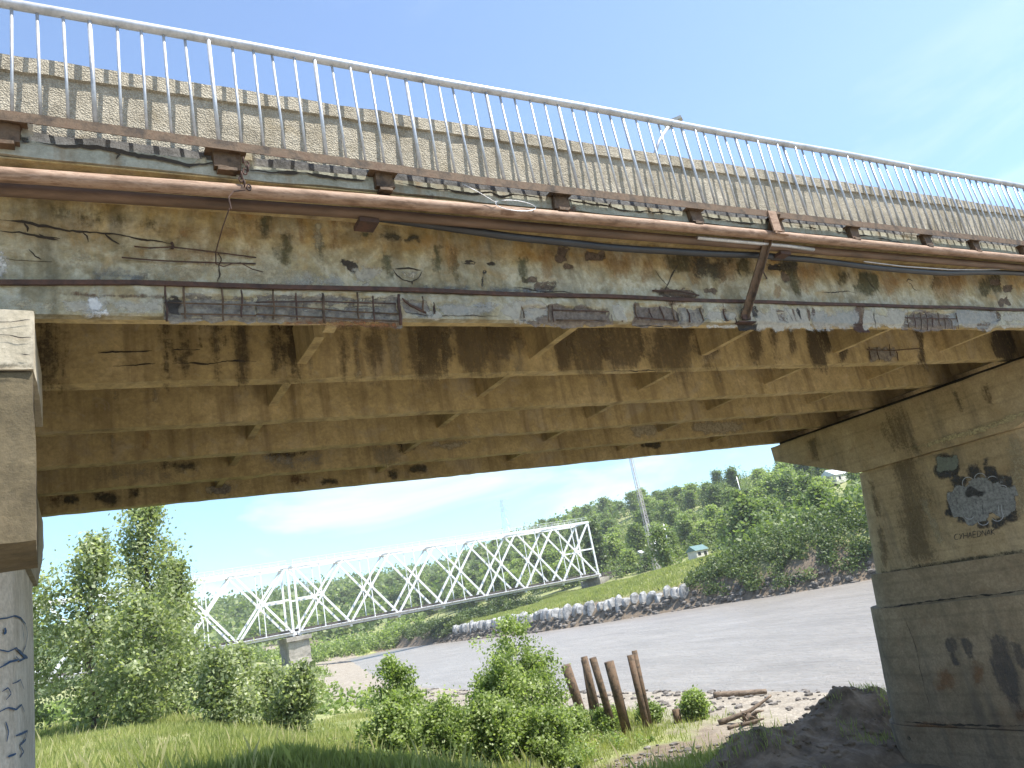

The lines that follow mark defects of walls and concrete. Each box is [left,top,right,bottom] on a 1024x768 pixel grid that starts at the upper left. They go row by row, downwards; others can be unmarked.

crack [36,142,213,168]
crack [3,220,170,262]
spalling [64,259,1024,332]
leakage [667,255,750,280]
leakage [777,261,801,295]
leakage [838,272,879,295]
crack [101,349,256,366]
leakage [154,324,252,402]
leakage [270,325,301,384]
leakage [341,326,524,388]
leakage [554,327,722,384]
spalling [867,344,920,362]